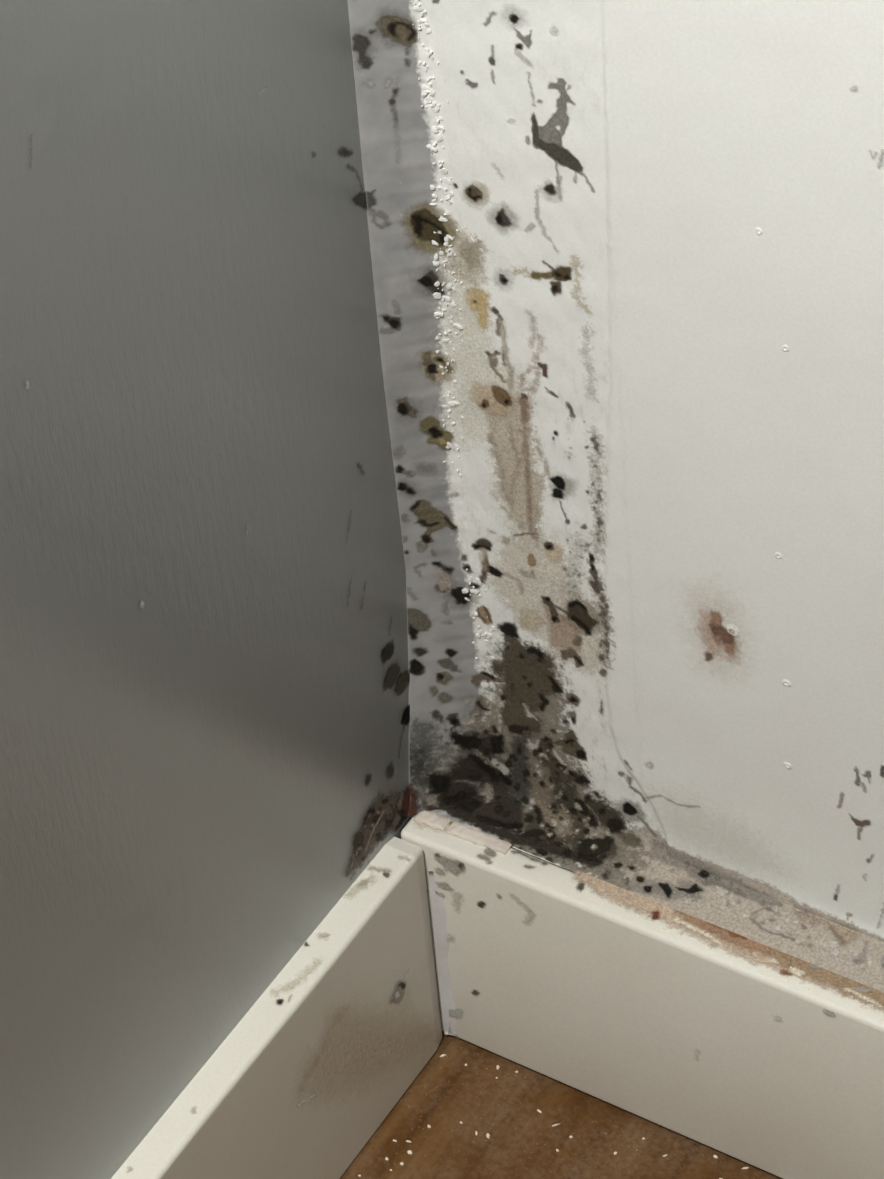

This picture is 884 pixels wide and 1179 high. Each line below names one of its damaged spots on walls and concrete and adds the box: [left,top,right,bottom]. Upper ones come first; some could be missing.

water stain [352,16,416,68]
peeling [526,78,594,192]
water stain [339,148,389,228]
water stain [454,184,487,203]
water stain [543,184,559,196]
peeling [412,0,465,476]
peeling [486,307,512,389]
peeling [462,569,496,660]
water stain [381,204,884,993]
rust [699,611,736,661]